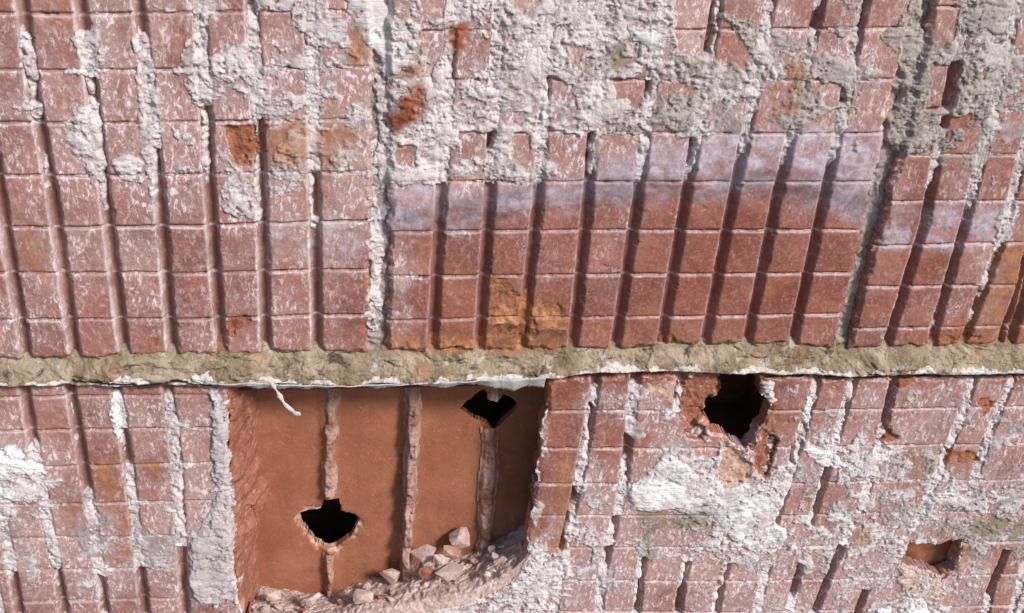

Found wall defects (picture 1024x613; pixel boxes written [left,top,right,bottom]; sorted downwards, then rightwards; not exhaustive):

crack [765,372,1024,380]
crack [72,379,214,387]
hole [703,373,765,439]